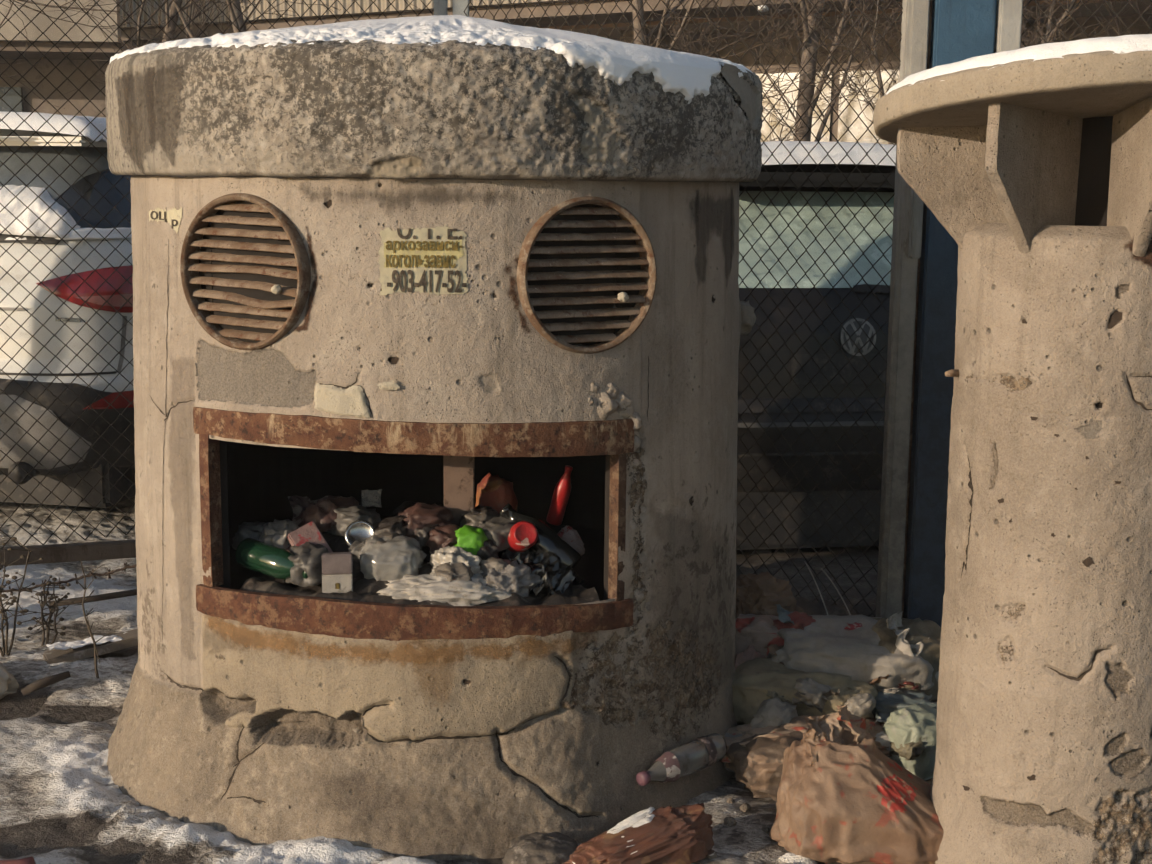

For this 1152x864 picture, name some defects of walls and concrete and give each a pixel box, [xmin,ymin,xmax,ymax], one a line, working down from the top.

spalling [720,62,761,131]
crack [961,458,973,578]
spalling [554,434,722,743]
corrosion [208,616,588,664]
crack [220,722,266,803]
spalling [199,688,368,749]
crack [362,656,598,818]
spalling [979,732,1152,864]
spalling [1105,663,1134,699]